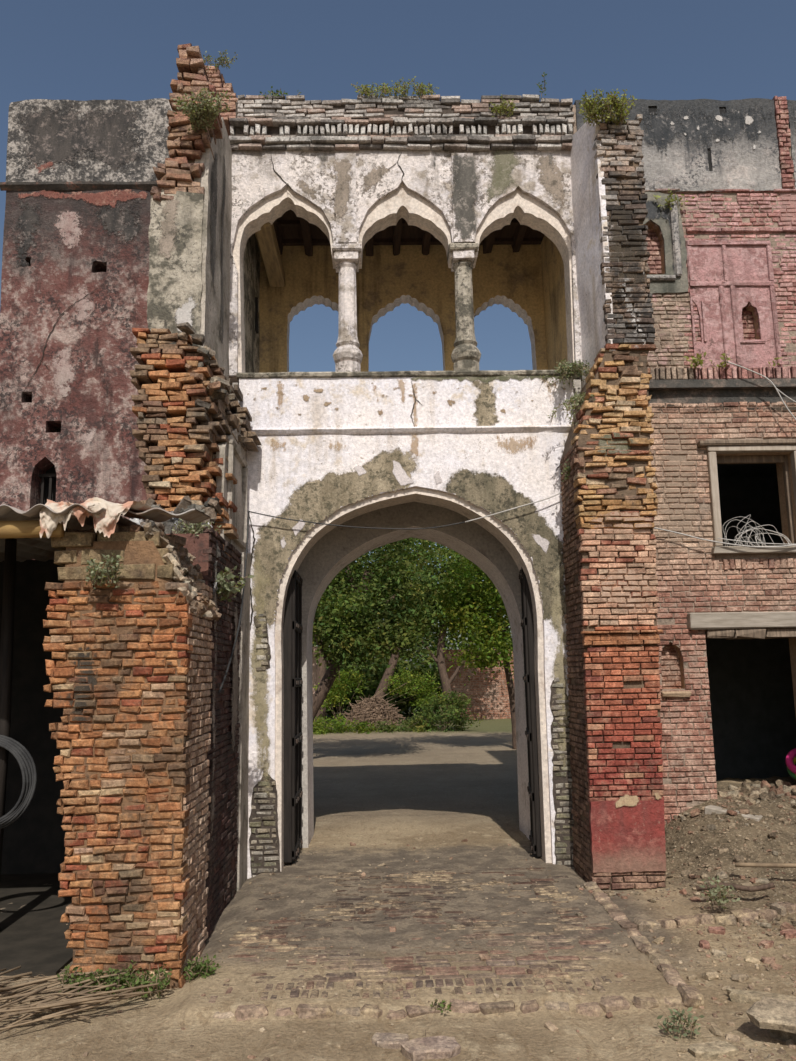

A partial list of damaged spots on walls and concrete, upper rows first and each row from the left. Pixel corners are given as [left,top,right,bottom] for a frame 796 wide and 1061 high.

leakage [15,102,144,172]
spalling [19,189,147,248]
leakage [450,154,482,239]
peeling [75,286,94,321]
peeling [52,347,76,397]
peeling [81,428,97,451]
peeling [253,448,418,671]
peeling [434,469,566,620]
spalling [249,771,280,878]
peeling [616,795,639,808]